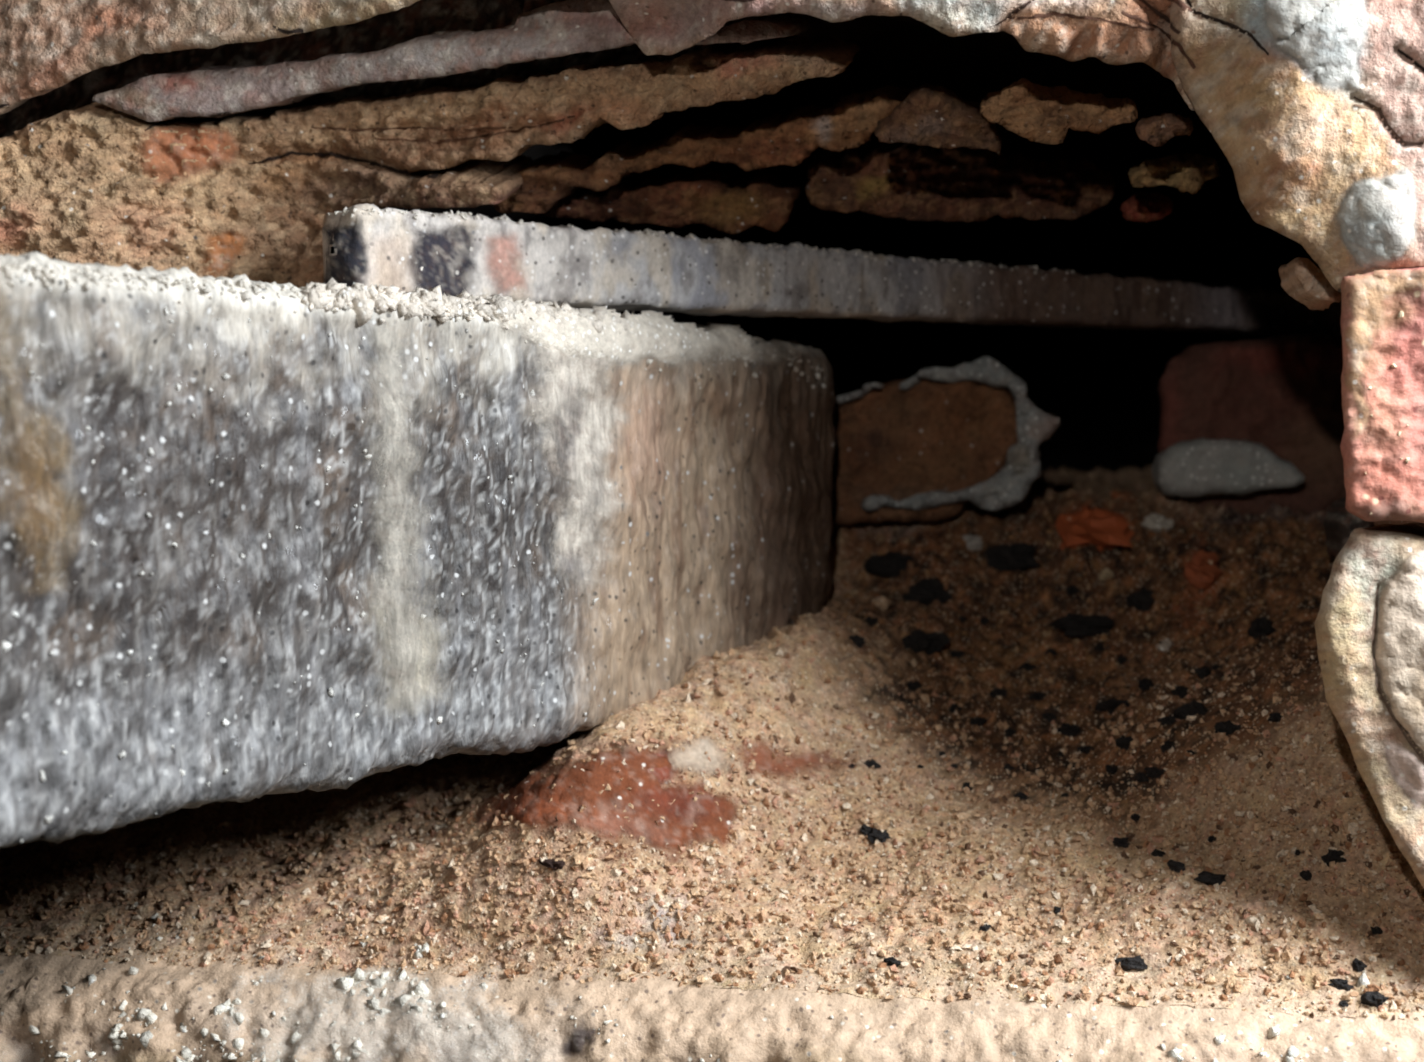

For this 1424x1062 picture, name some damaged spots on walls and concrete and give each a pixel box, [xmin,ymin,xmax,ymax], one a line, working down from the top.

crack [0,0,727,179]
crack [995,0,1269,69]